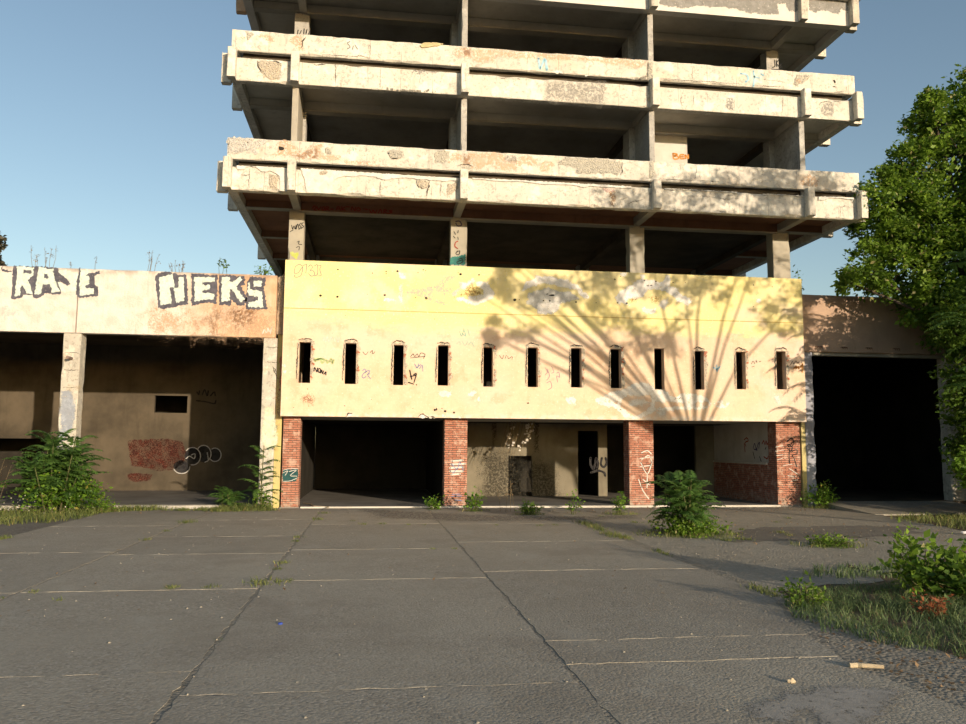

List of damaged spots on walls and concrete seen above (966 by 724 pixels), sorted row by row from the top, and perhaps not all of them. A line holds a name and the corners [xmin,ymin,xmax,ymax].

spalling [257,60,282,80]
flaking render [226,136,459,196]
spalling [434,150,631,192]
peeling [452,278,495,306]
peeling [522,275,589,315]
peeling [615,273,692,314]
leakage [134,302,283,350]
peeling [595,345,732,420]
flaking render [734,347,749,389]